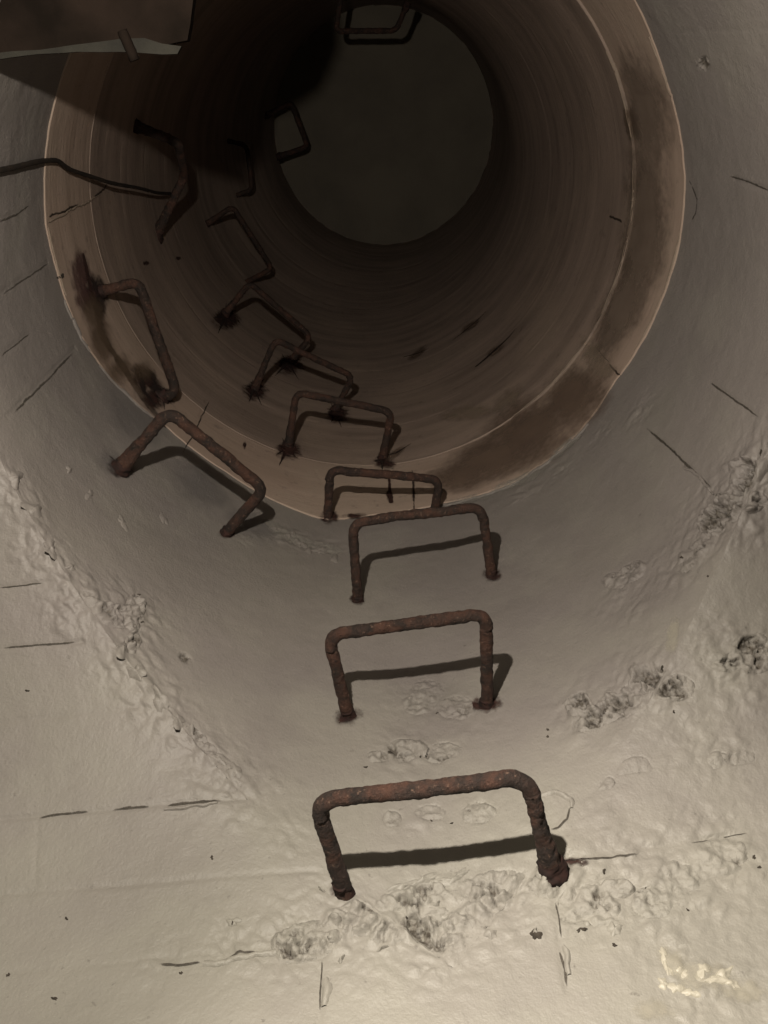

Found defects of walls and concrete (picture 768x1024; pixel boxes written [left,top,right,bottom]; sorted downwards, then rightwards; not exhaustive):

rust [72,253,108,313]
damp [437,63,664,490]
rust [134,371,172,409]
crack [712,384,756,416]
rust [106,453,132,478]
rust [375,454,396,503]
crack [651,432,721,496]
rust [337,708,357,723]
rust [472,697,500,710]
crack [42,810,86,818]
crack [116,800,217,811]
rust [536,853,587,887]